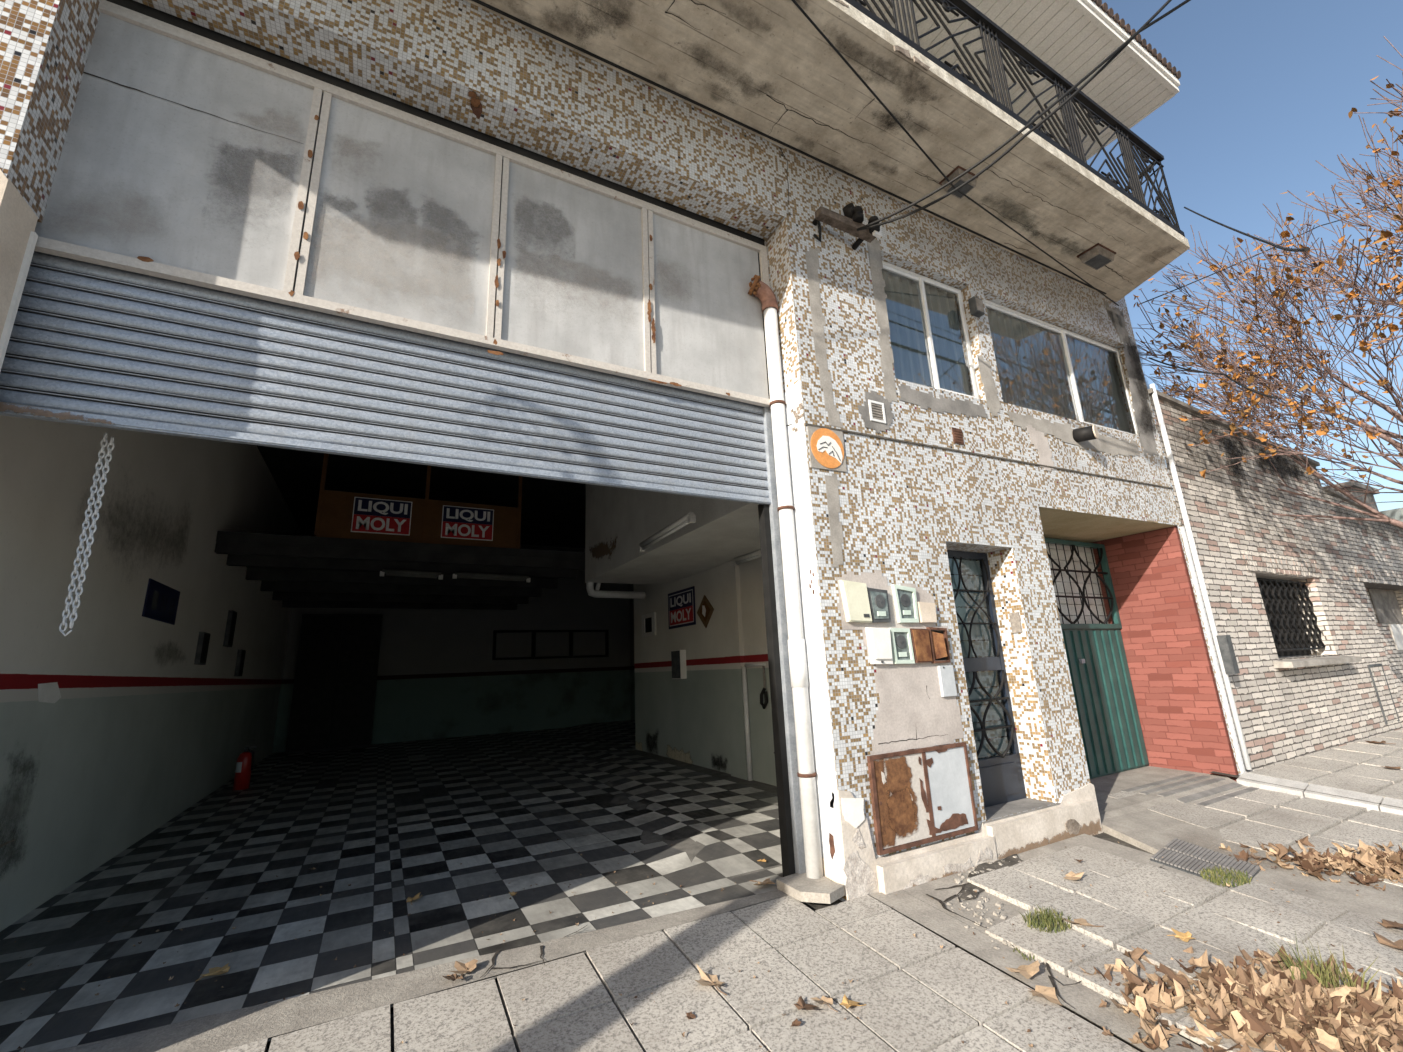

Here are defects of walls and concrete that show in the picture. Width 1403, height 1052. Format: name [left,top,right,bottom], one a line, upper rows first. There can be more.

crack [665,0,726,30]
crack [83,72,303,144]
corrosion [494,238,506,306]
corrosion [647,283,656,343]
corrosion [869,749,968,847]